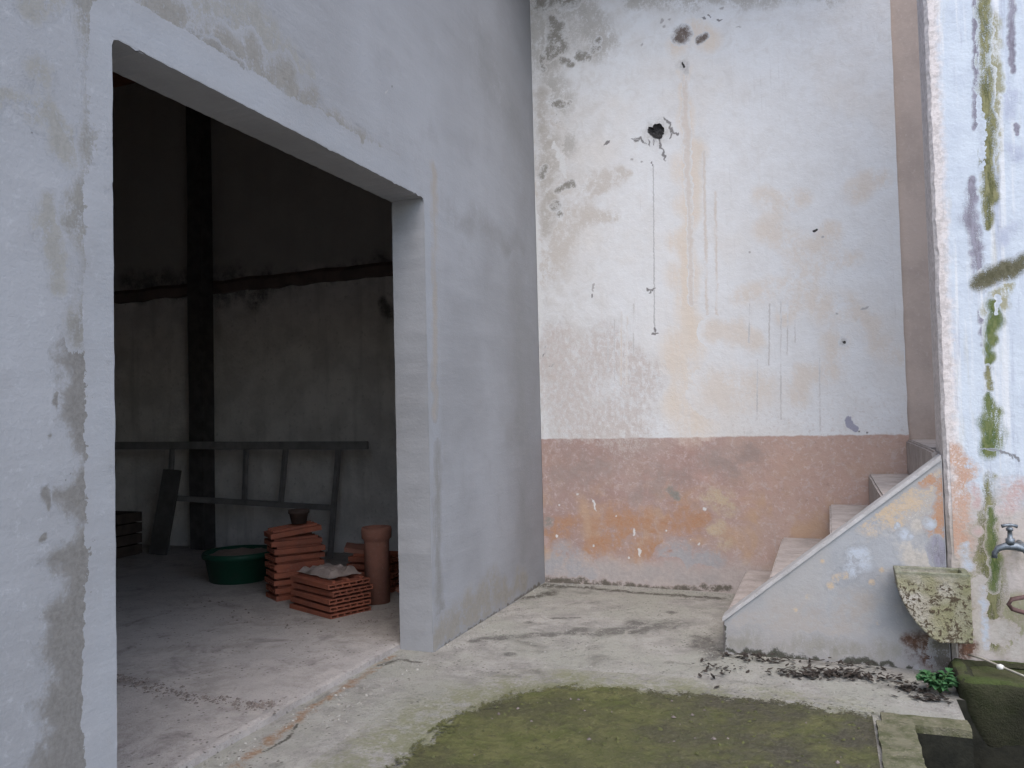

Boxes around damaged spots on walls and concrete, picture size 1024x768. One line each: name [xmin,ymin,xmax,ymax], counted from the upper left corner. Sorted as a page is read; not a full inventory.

damp [530,0,849,162]
damp [970,0,980,132]
damp [1001,0,1024,165]
peeling [533,83,680,342]
damp [957,174,1024,275]
damp [0,0,102,768]